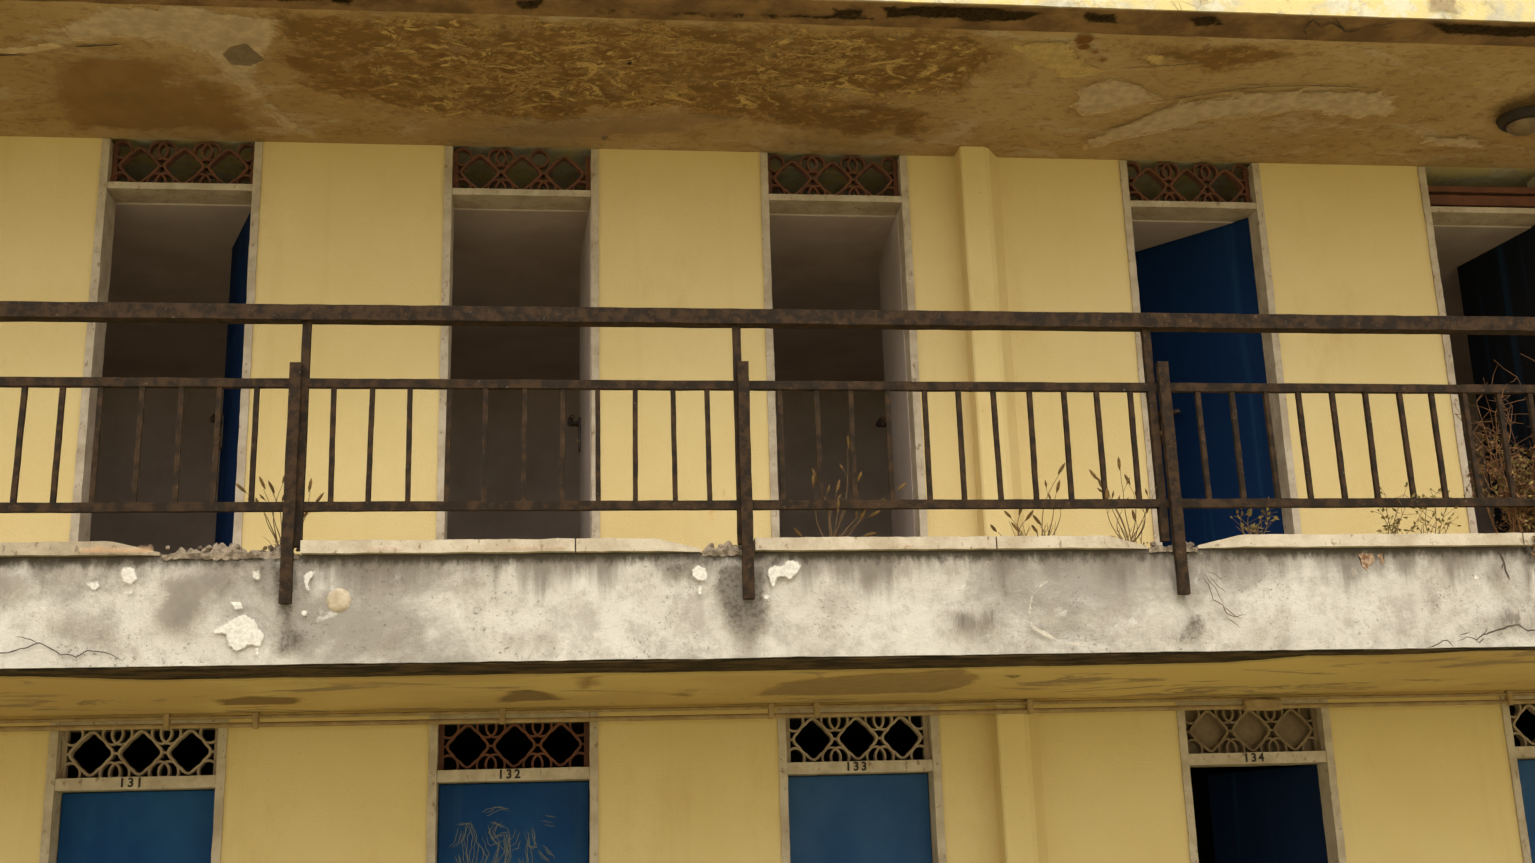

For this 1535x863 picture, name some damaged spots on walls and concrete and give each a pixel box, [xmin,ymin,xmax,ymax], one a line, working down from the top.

water stain [55,58,246,134]
peeling [0,5,317,138]
water stain [271,0,1041,148]
peeling [1012,42,1395,148]
water stain [1128,45,1293,73]
peeling [1415,130,1483,148]
spalling [161,542,315,590]
peeling [764,560,801,599]
crack [1498,550,1510,580]
crack [0,637,123,661]
peeling [213,602,264,654]
crack [1428,624,1535,648]